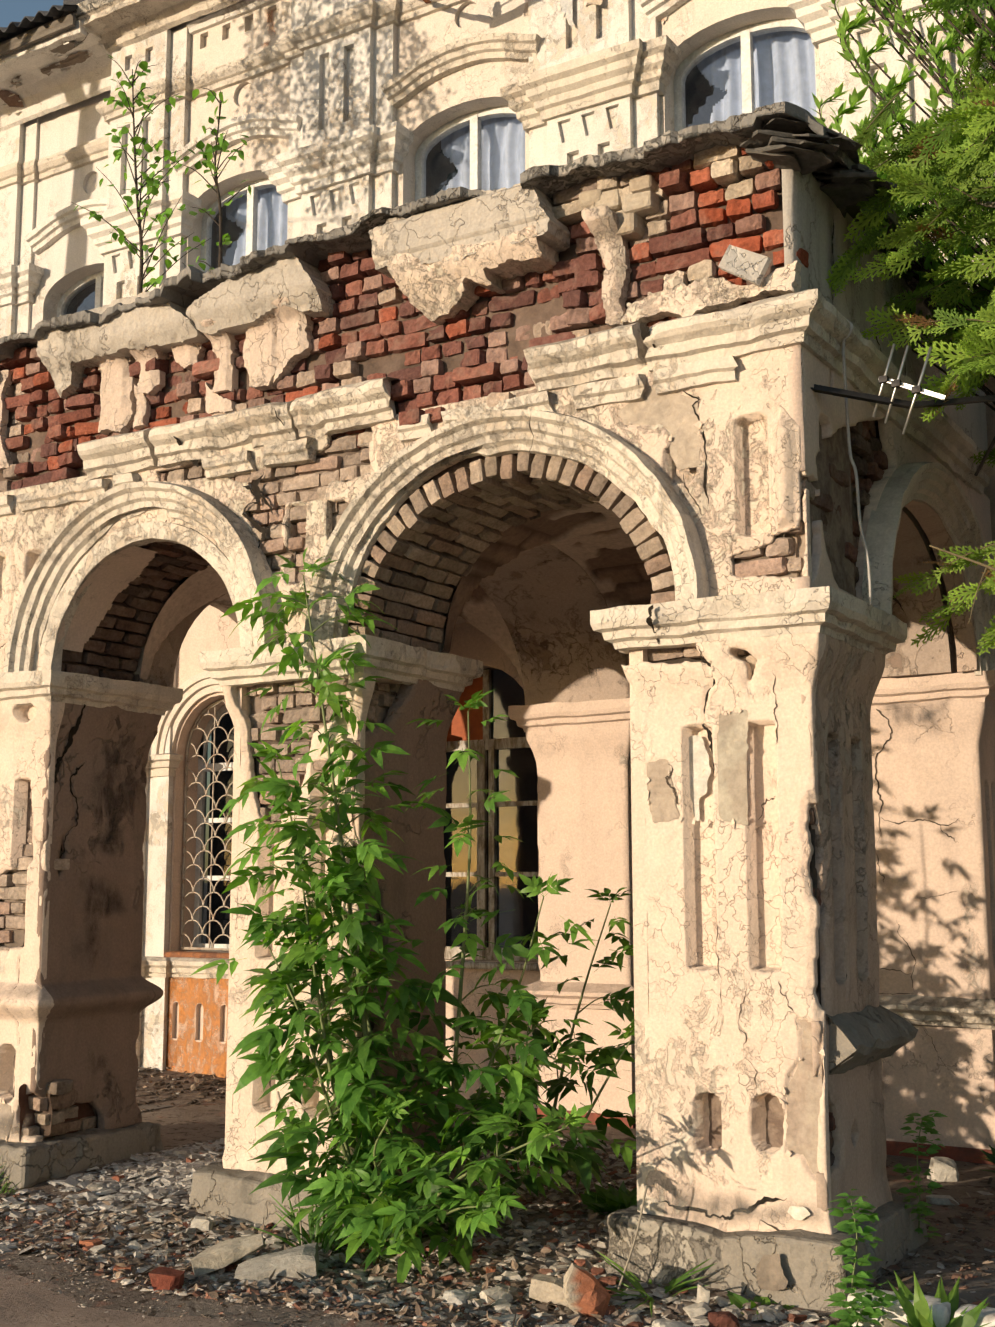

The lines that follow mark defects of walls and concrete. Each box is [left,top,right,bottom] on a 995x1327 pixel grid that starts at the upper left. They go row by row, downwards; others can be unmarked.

spalling [0,118,897,492]
spalling [733,420,888,597]
spalling [647,646,707,664]
spalling [737,650,757,679]
crack [54,704,86,856]
peeling [644,708,749,829]
crack [845,699,958,882]
spalling [0,816,33,972]
crack [879,924,916,995]
crack [658,1196,787,1231]